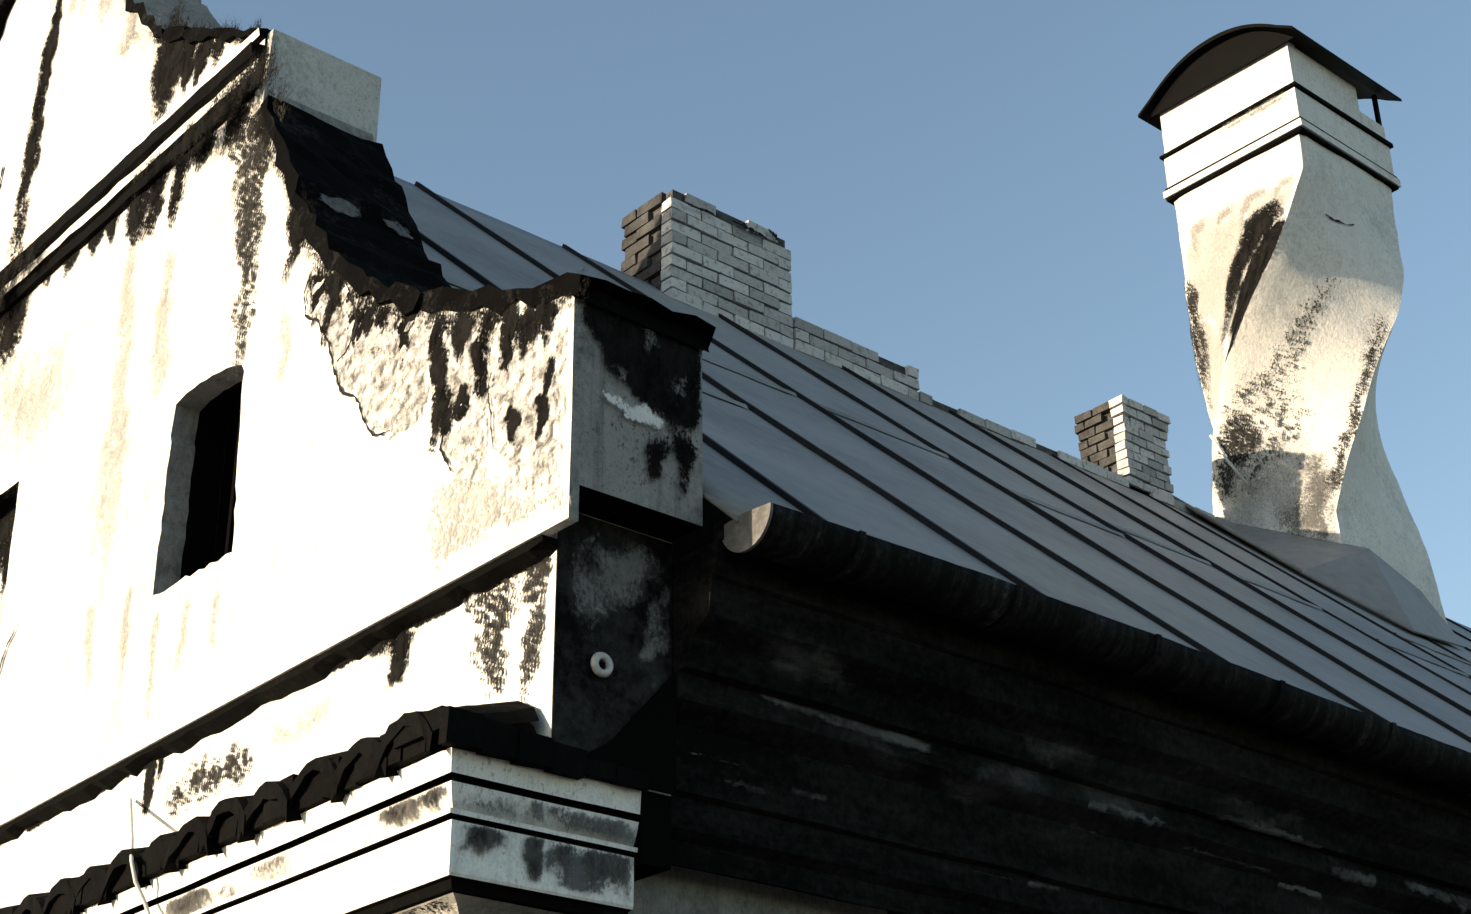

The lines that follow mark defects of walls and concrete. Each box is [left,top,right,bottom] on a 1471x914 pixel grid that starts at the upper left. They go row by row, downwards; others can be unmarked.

water stain [7,0,261,260]
water stain [225,62,291,380]
water stain [306,258,328,325]
spalling [303,267,571,572]
water stain [428,303,536,452]
water stain [503,356,554,444]
water stain [671,428,698,497]
water stain [1184,175,1389,540]
water stain [0,533,13,593]
water stain [483,595,543,702]
peeling [1279,883,1321,897]